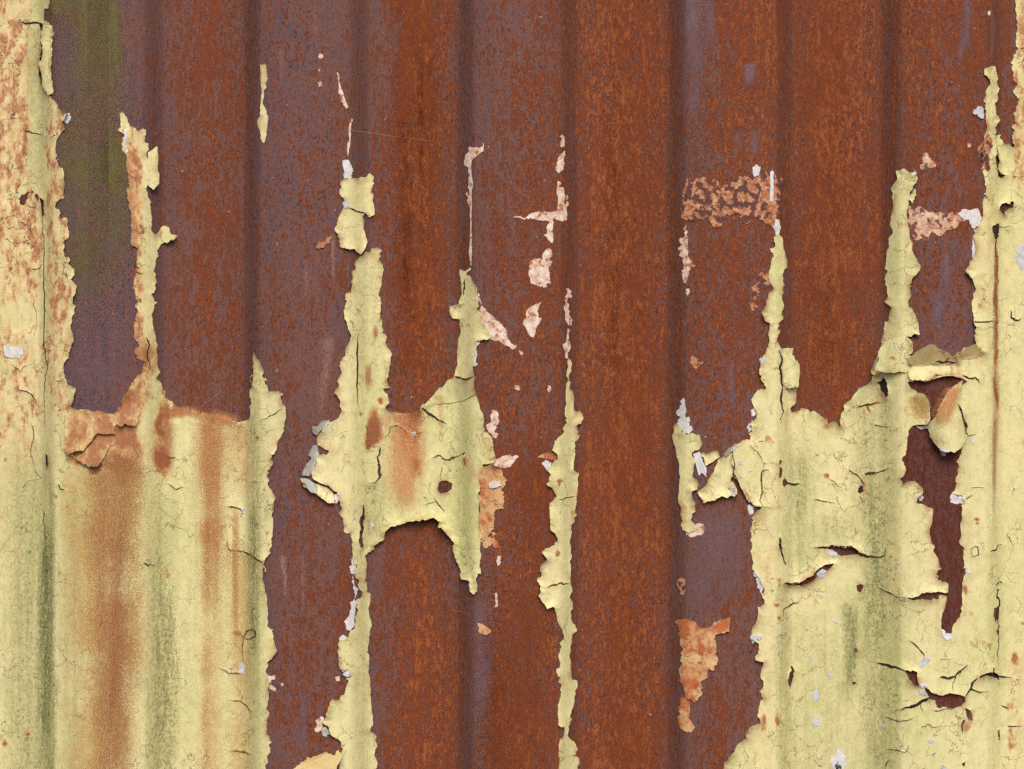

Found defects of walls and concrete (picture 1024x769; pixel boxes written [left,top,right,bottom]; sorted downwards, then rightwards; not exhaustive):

peeling [528,248,552,288]
corrosion [78,467,138,769]
peeling [0,0,286,769]
corrosion [371,415,421,499]
peeling [294,173,507,769]
crack [356,333,447,539]
peeling [537,329,583,769]
crack [777,351,785,423]
crack [732,441,888,508]
crack [779,537,886,615]
peeling [672,0,1024,769]
crack [879,581,1013,766]